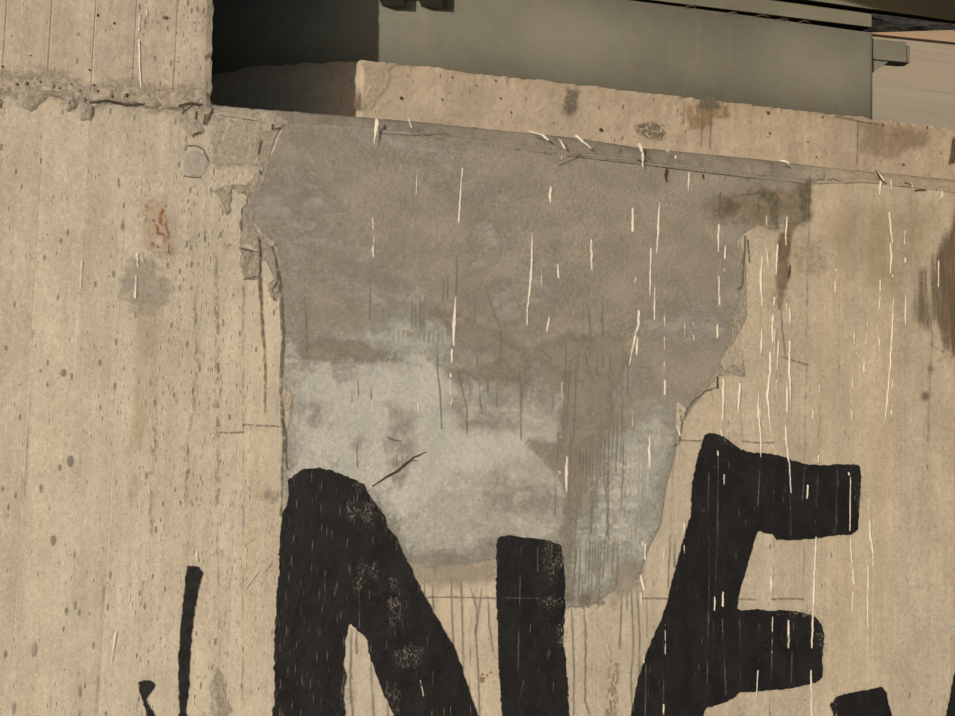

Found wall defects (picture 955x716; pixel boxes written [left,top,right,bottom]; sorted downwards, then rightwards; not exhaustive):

spalling [180,104,213,137]
rust [145,195,170,254]
spalling [214,116,288,301]
spalling [673,236,750,447]
water stain [712,180,811,457]
water stain [851,293,906,425]
water stain [918,218,955,354]
crack [372,437,426,487]